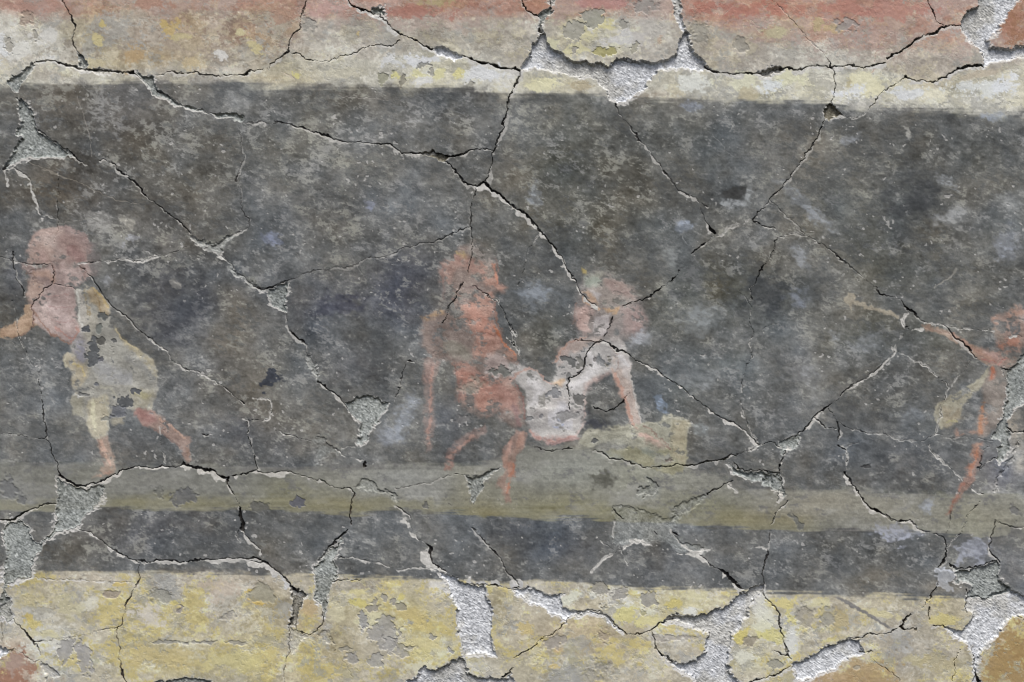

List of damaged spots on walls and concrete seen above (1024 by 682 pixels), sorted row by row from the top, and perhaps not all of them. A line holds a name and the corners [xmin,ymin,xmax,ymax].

crack [21,0,434,101]
spalling [521,0,715,107]
spalling [961,0,1024,68]
spalling [4,63,73,171]
crack [231,0,1024,682]
crack [0,130,523,682]
spalling [345,395,391,448]
spalling [0,472,108,625]
spalling [406,572,516,682]
spalling [652,585,767,682]
spalling [944,560,1024,682]